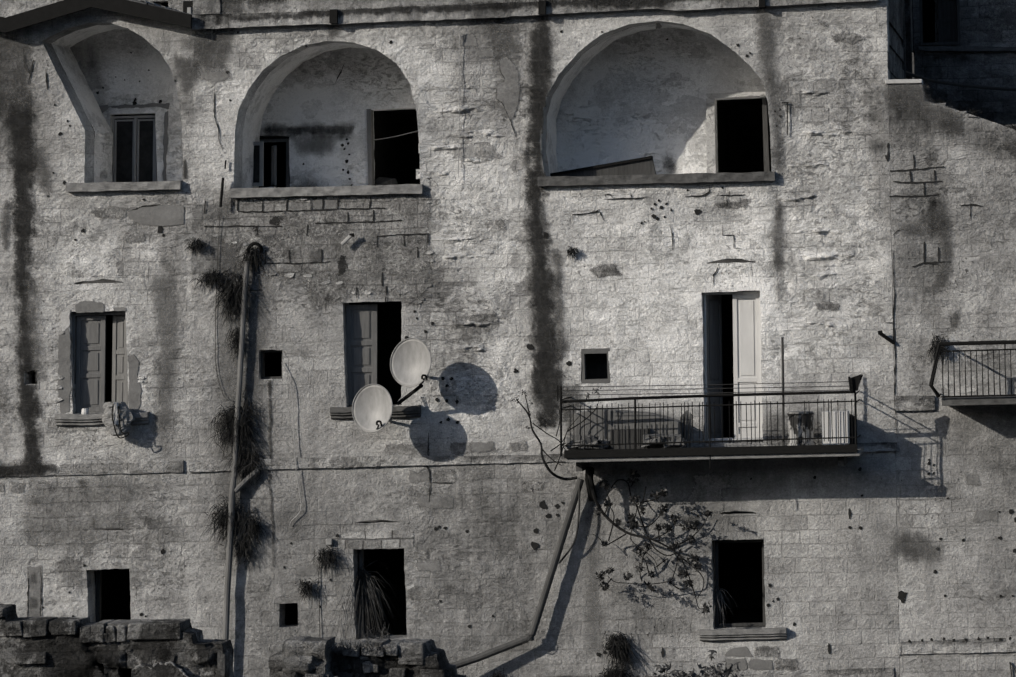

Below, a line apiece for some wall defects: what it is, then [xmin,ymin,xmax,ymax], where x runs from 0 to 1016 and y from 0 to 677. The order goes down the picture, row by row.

water stain [176,29,233,92]
water stain [758,11,784,170]
water stain [0,41,56,479]
water stain [220,0,681,455]
water stain [773,202,782,269]